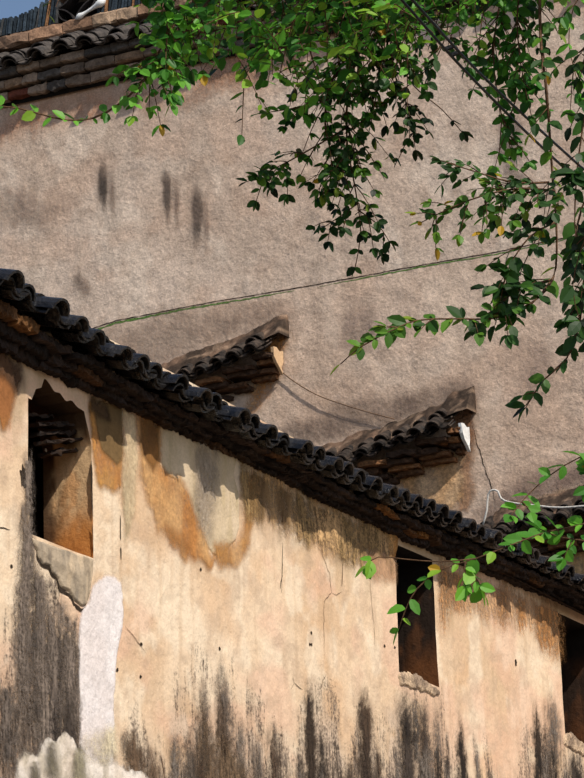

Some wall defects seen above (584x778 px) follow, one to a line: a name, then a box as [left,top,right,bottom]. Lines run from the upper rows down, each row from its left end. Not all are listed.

damp [98,165,113,208]
damp [163,173,179,215]
damp [192,192,209,232]
corrosion [0,353,23,430]
corrosion [137,418,254,569]
damp [0,454,160,778]
damp [170,671,280,778]
damp [297,692,326,778]
damp [348,694,382,778]
damp [394,693,481,778]
damp [534,703,582,778]